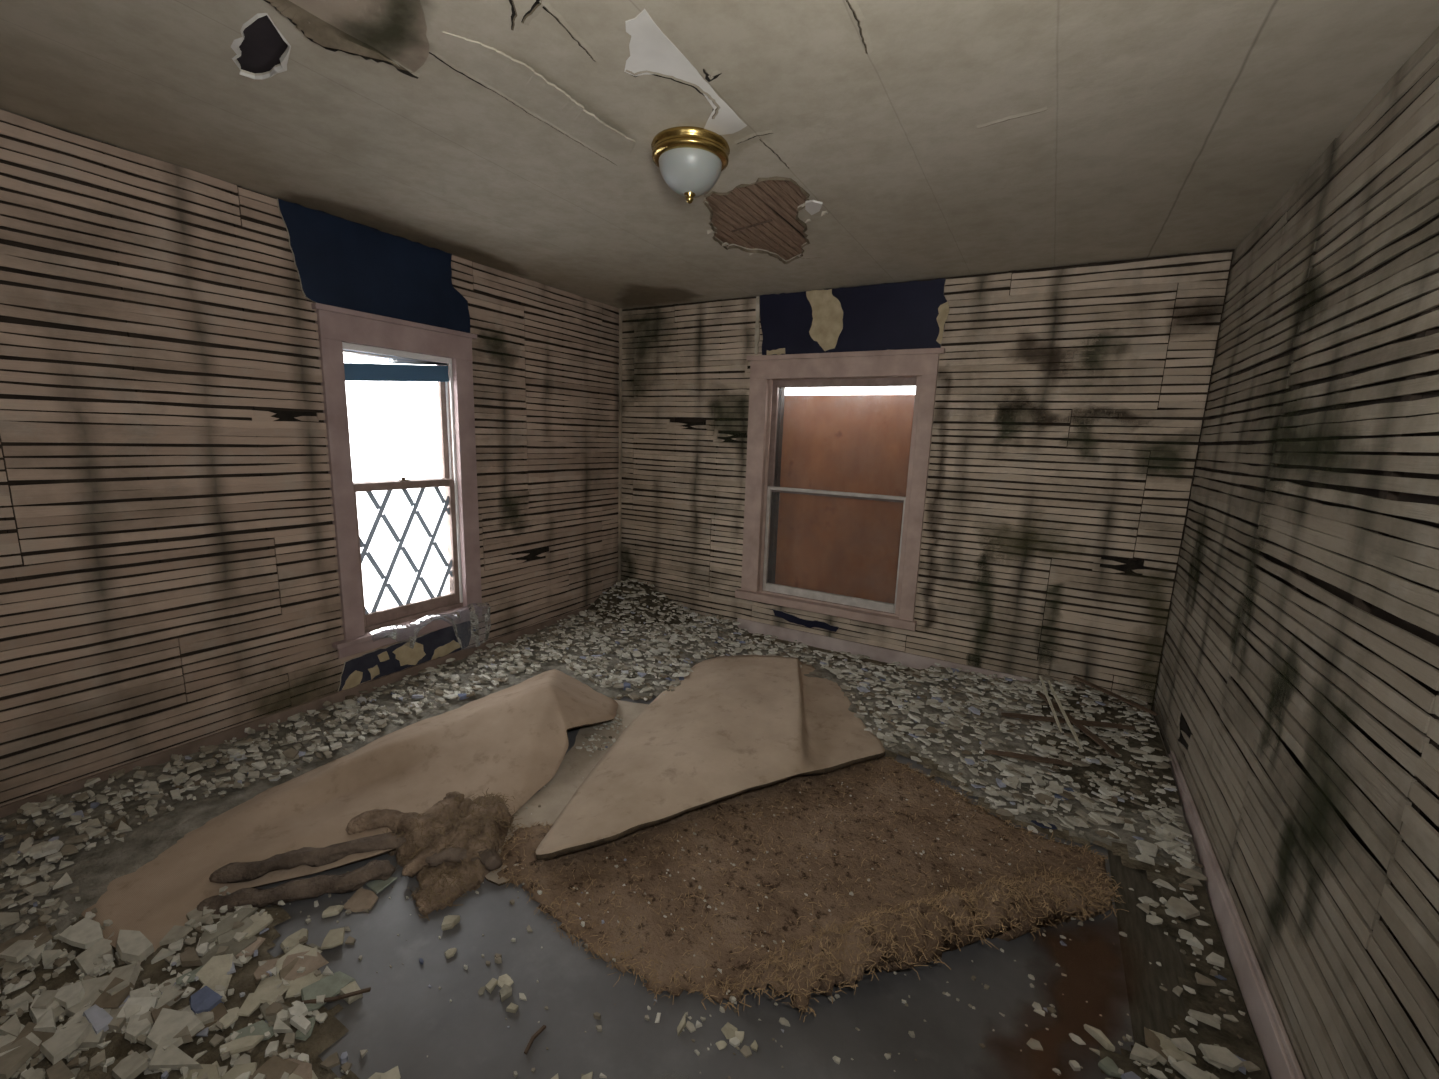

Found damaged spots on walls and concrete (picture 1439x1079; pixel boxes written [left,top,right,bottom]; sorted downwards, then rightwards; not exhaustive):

peeling [231,0,429,80]
crack [429,50,620,165]
crack [509,0,793,169]
peeling [624,9,747,135]
spalling [703,176,828,264]
flaking render [277,198,470,333]
flaking render [755,278,950,355]
damp [1017,335,1122,374]
damp [999,402,1136,456]
damp [969,527,1053,667]
flaking render [338,621,471,692]